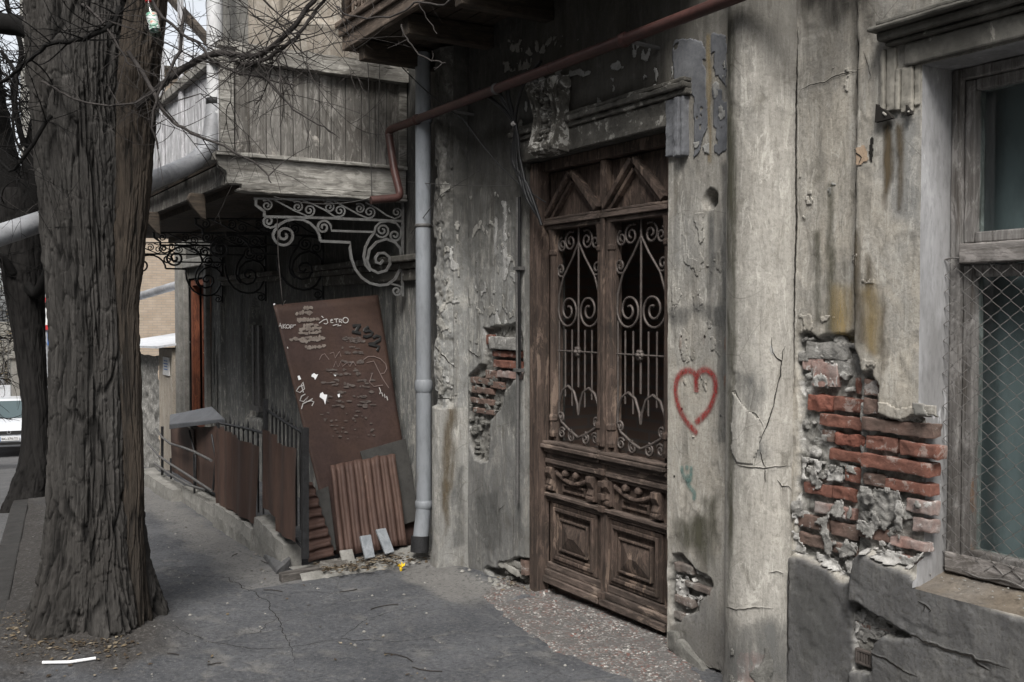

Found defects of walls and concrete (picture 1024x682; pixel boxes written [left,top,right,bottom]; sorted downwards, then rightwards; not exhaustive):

peeling [503,35,591,85]
peeling [632,41,658,85]
peeling [671,32,727,157]
peeling [472,192,515,283]
crack [731,27,872,490]
spalling [434,221,524,460]
spalling [790,314,948,574]
crack [173,574,475,655]
spalling [667,561,773,682]
crack [727,560,791,680]